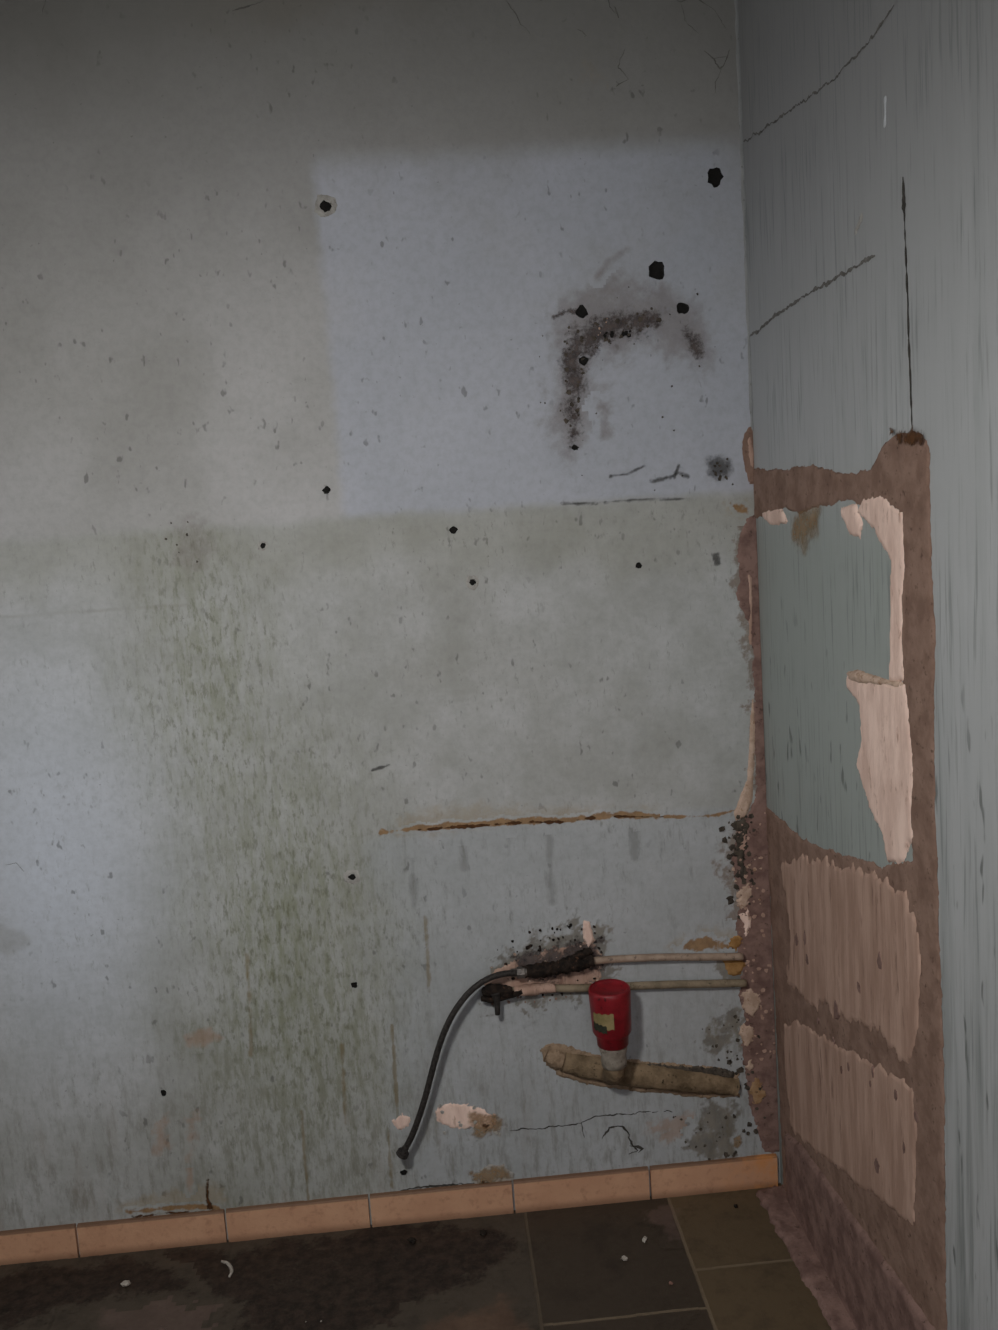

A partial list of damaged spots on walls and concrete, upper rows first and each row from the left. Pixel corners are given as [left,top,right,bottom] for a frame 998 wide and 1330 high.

mould [512,241,740,493]
water stain [156,498,233,597]
flaking render [702,426,948,1330]
flaking render [460,904,631,1031]
water stain [688,993,746,1072]
water stain [384,1021,402,1191]
peeling [435,1103,501,1137]
water stain [630,1096,752,1162]